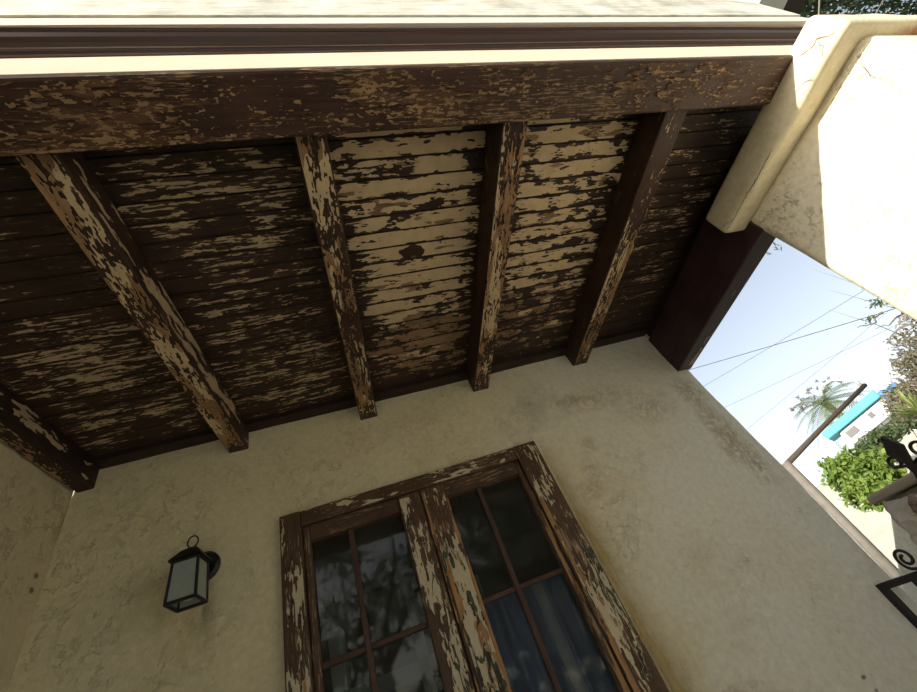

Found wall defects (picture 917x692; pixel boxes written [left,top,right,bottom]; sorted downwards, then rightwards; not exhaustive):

crack [797,27,837,57]
peeling [0,61,778,486]
peeling [285,553,322,692]
peeling [331,461,512,692]
peeling [487,444,651,692]